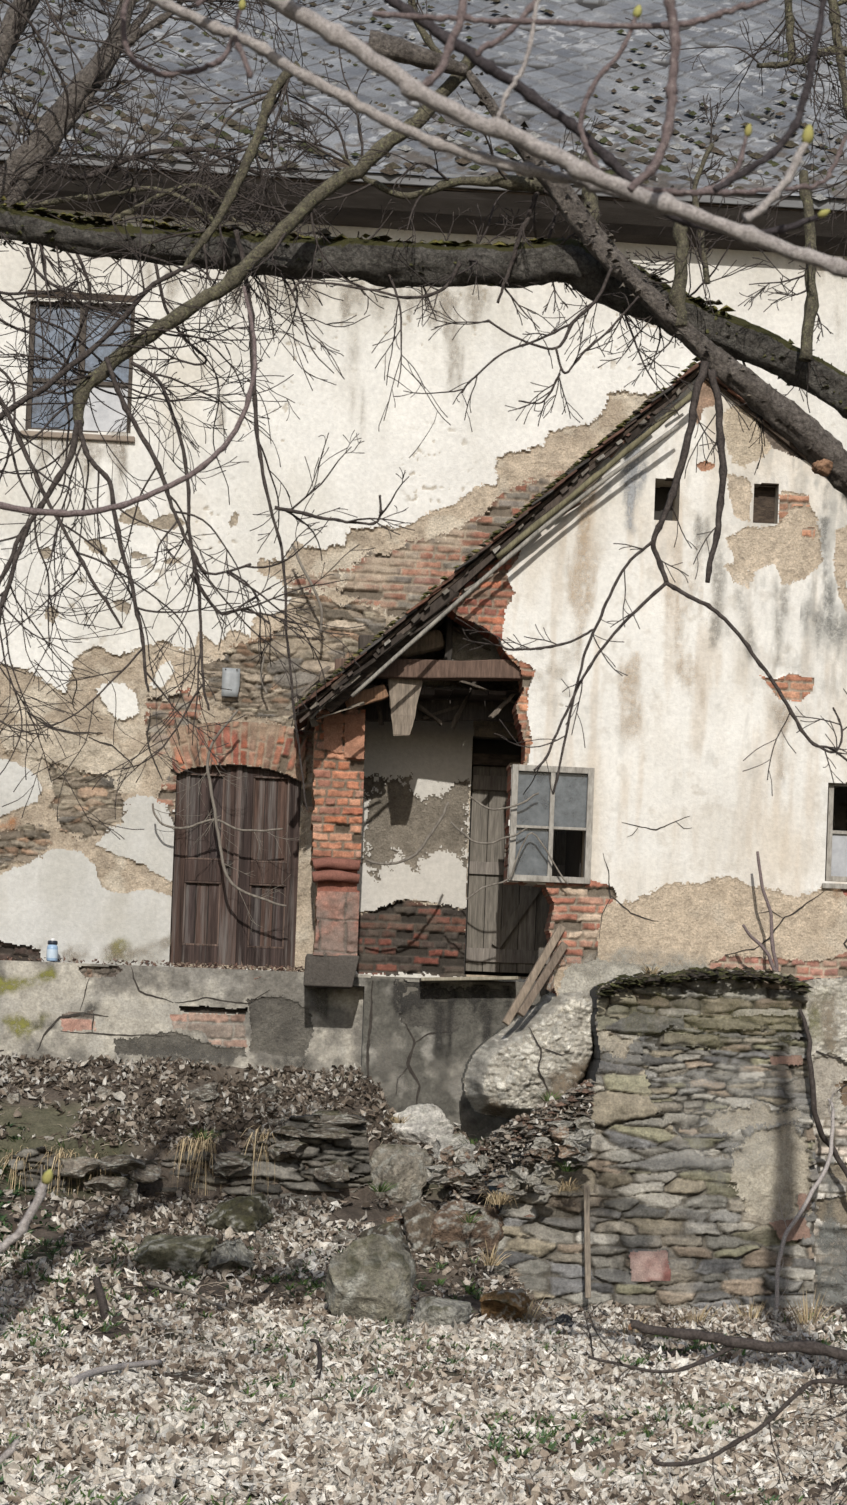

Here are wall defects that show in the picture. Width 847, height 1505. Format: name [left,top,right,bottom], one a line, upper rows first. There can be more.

spalling [696,380,847,612]
spalling [0,389,663,978]
spalling [759,673,814,702]
peeling [356,772,847,1035]
spalling [60,1009,96,1032]
crack [0,967,269,1051]
spalling [114,995,314,1058]
crack [366,980,449,1104]
spalling [812,1052,847,1307]